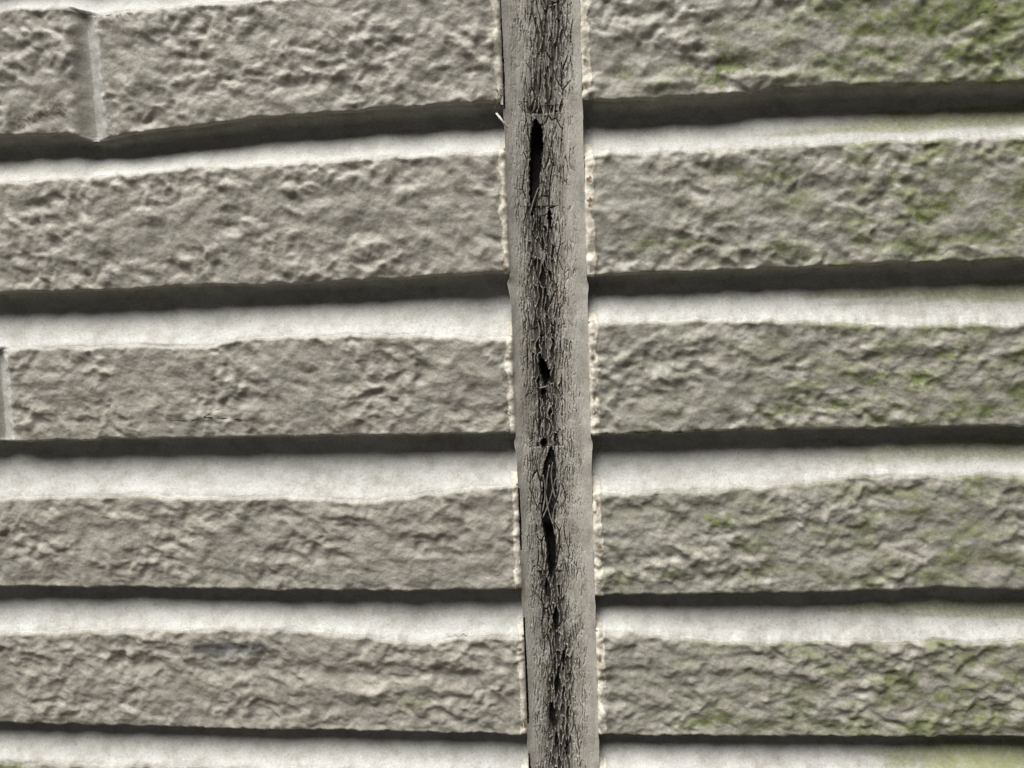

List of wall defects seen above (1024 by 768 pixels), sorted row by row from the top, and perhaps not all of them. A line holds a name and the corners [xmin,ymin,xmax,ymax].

crack [500,0,590,768]